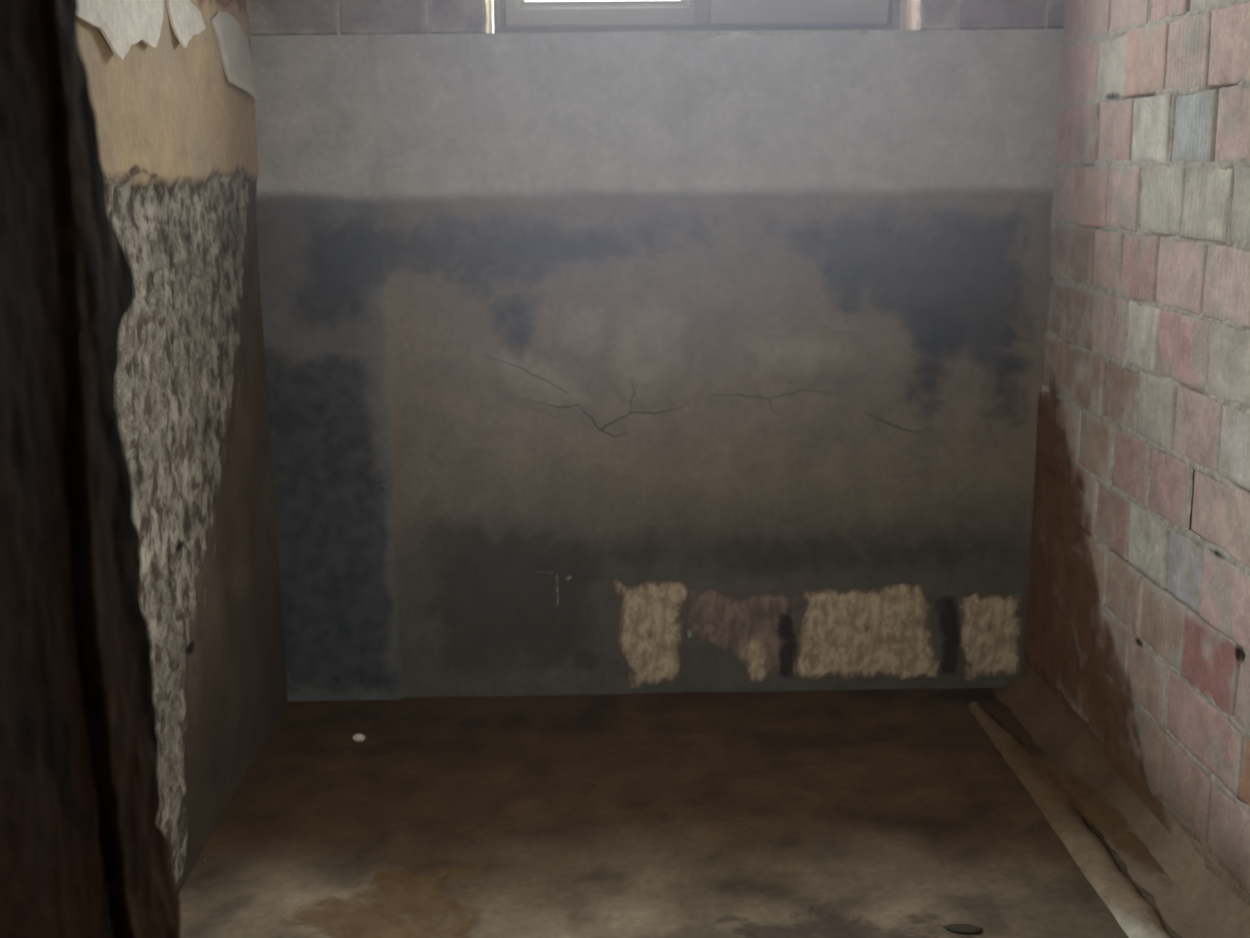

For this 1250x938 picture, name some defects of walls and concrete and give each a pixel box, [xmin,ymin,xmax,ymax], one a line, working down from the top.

peeling [77,0,262,99]
crack [479,355,834,438]
peeling [616,581,939,688]
peeling [960,594,1020,680]